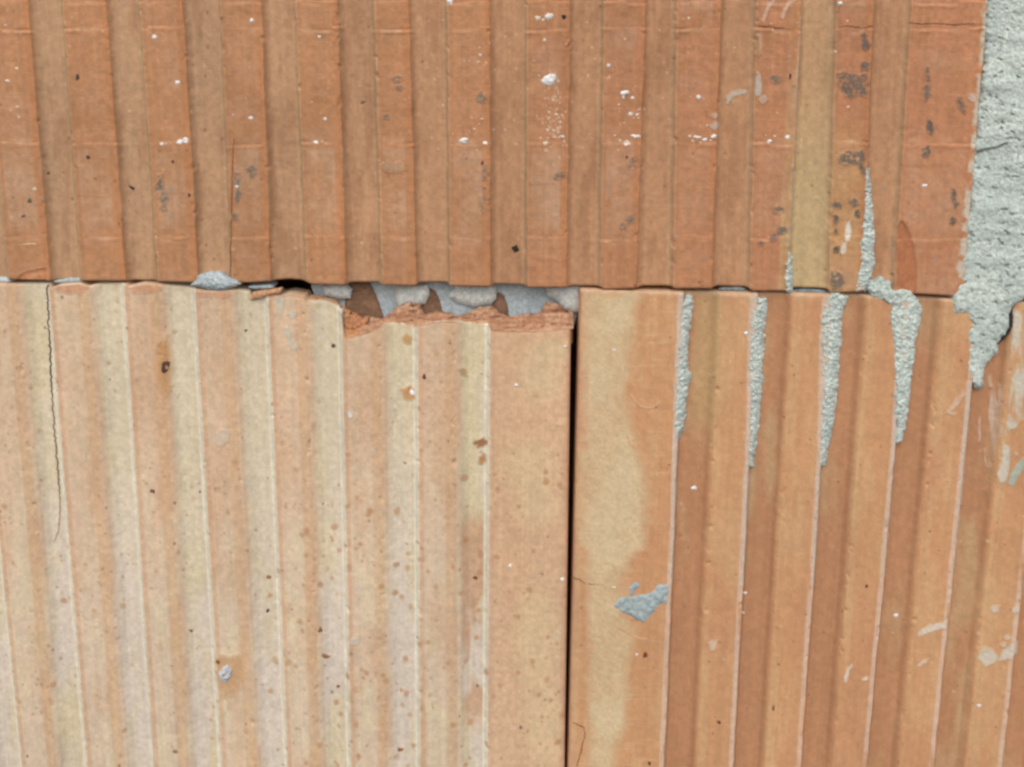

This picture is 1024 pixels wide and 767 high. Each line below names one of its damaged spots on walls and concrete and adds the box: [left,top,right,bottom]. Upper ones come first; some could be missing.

crack [46,284,61,541]
spalling [249,287,573,343]